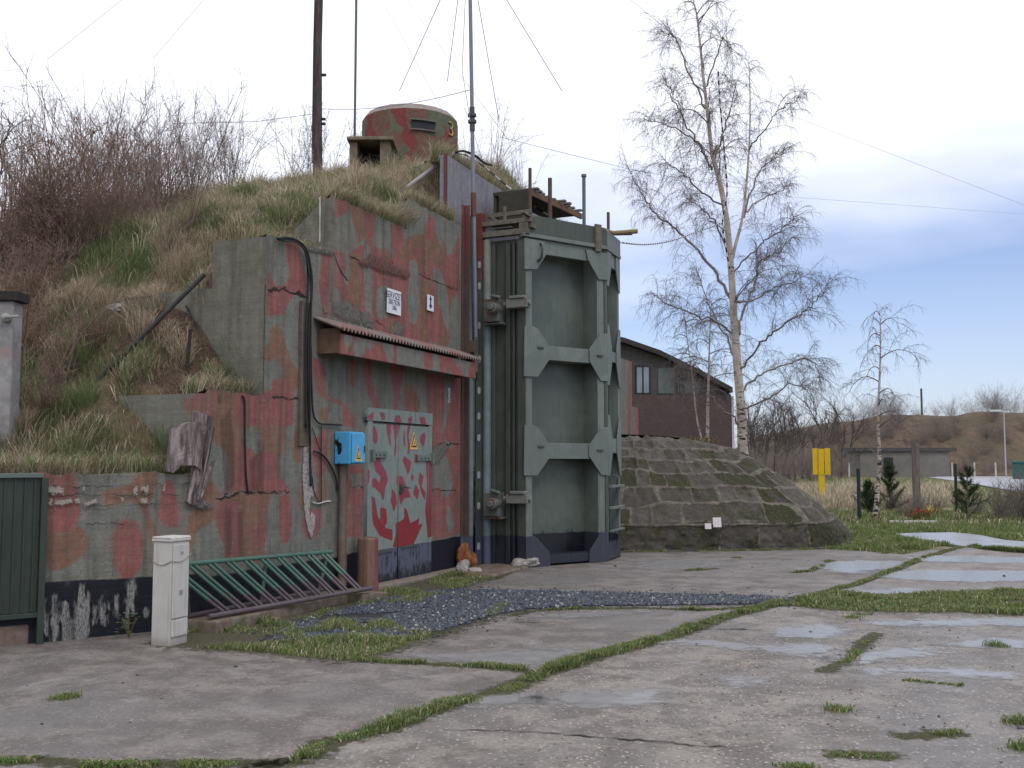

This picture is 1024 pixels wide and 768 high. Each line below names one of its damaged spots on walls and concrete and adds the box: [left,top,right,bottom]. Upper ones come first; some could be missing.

crack [268,286,306,298]
peeling [48,485,98,507]
peeling [121,485,149,504]
crack [215,490,289,500]
crack [445,729,726,747]